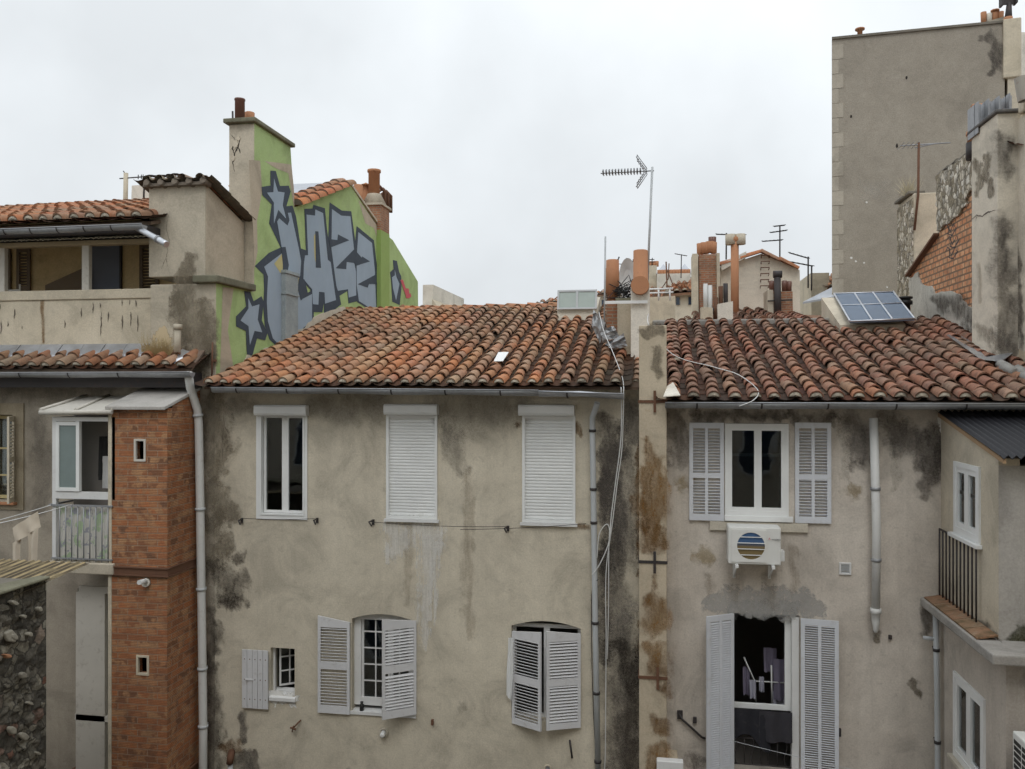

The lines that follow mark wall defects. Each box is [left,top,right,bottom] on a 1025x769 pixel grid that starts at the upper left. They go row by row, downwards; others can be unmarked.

water stain [973,131,1012,198]
water stain [989,218,1024,356]
corrosion [629,436,671,552]
water stain [203,391,249,769]
water stain [596,402,639,769]
corrosion [637,582,672,697]
corrosion [647,717,670,769]